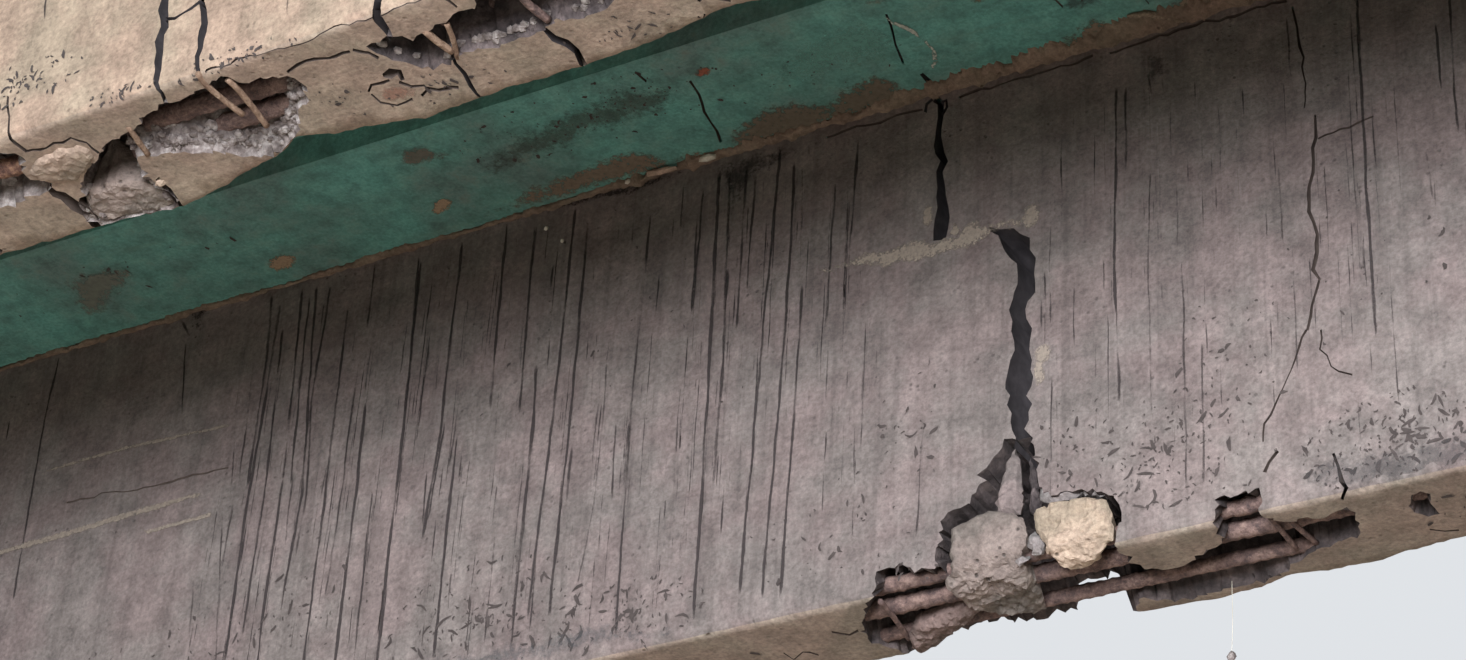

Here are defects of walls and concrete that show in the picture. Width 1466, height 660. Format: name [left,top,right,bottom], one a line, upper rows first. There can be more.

crack [153,0,480,106]
spalling [366,0,614,70]
crack [544,28,583,66]
crack [6,96,99,227]
spalling [0,65,309,226]
crack [689,81,720,142]
crack [826,0,1374,473]
crack [67,467,228,503]
crack [1332,454,1348,497]
spalling [861,437,1360,653]